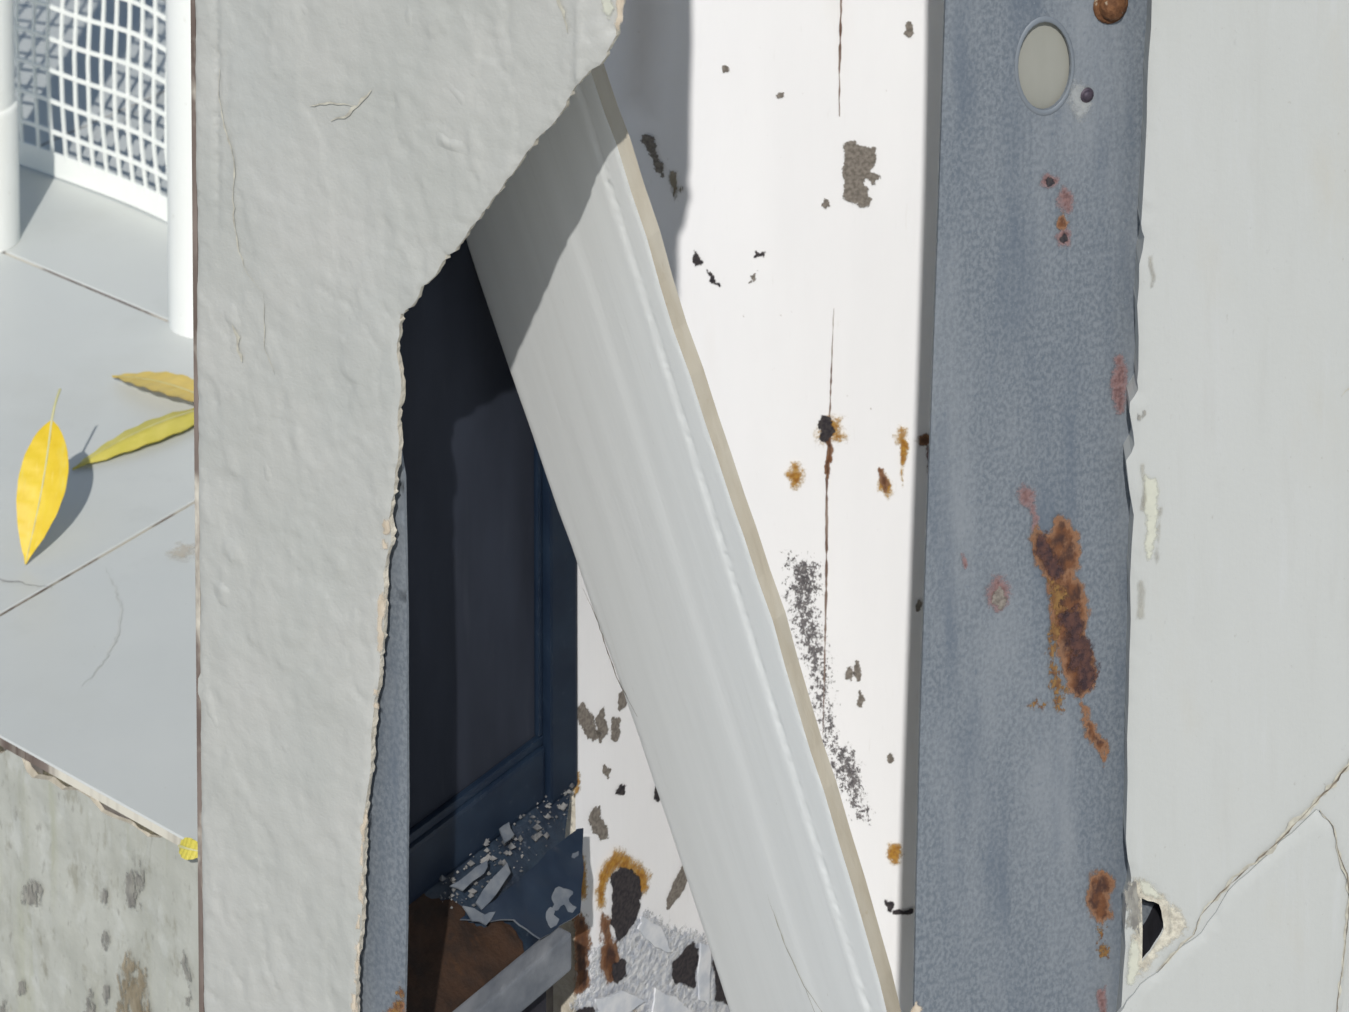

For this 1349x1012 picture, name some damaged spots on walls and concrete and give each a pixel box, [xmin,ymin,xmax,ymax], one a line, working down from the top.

peeling [821,140,881,208]
corrosion [1040,173,1074,246]
corrosion [786,462,803,489]
corrosion [818,415,847,479]
corrosion [878,427,929,497]
corrosion [1017,485,1109,767]
water stain [781,551,872,825]
peeling [569,866,730,1012]
corrosion [1085,870,1115,958]
flaking render [1124,879,1187,985]
crack [1156,761,1349,1012]
corrosion [387,986,405,1012]